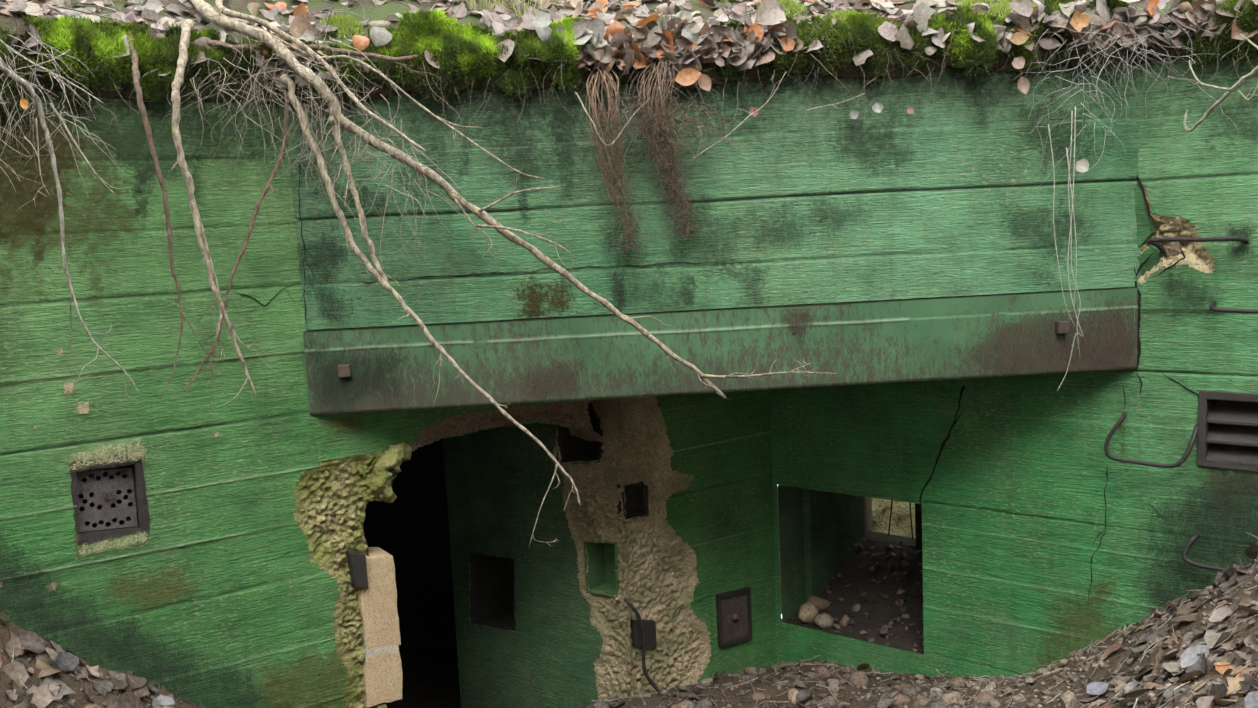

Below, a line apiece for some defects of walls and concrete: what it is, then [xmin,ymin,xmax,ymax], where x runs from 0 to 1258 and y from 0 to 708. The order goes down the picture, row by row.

crack [919,386,966,505]
spalling [293,396,711,708]
crack [1086,471,1108,608]